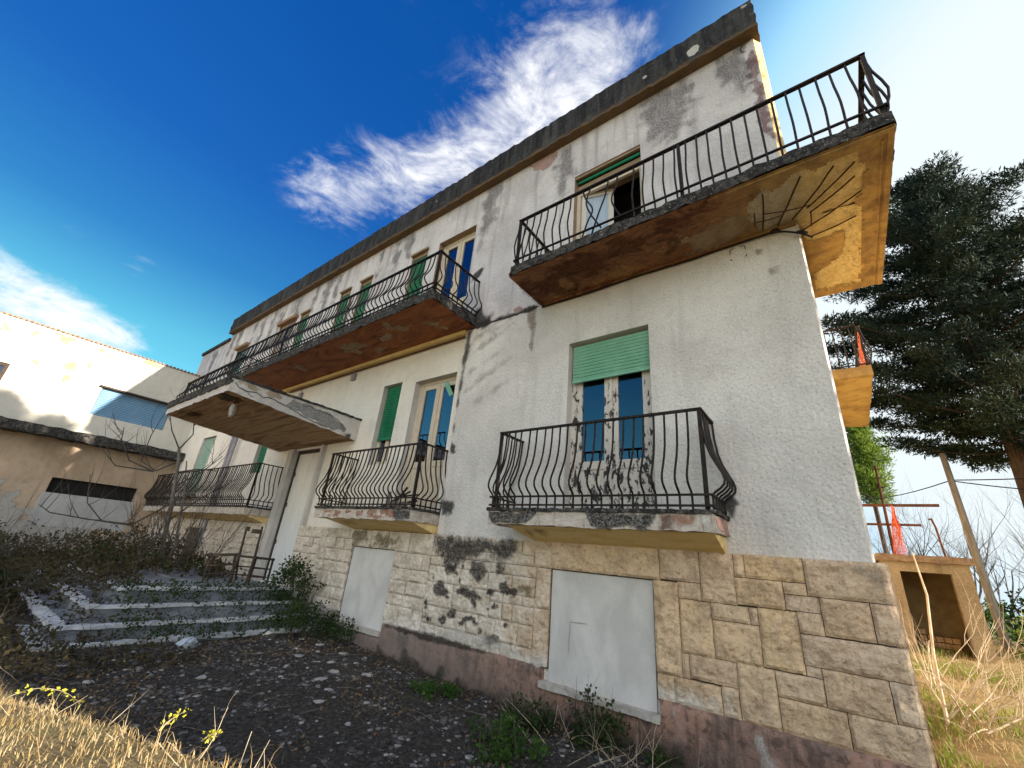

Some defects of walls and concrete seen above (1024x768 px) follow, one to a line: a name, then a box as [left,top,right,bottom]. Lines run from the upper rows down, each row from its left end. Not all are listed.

leakage [642,78,693,139]
spalling [746,151,869,291]
leakage [470,309,491,336]
crack [235,382,343,428]
leakage [385,535,530,688]